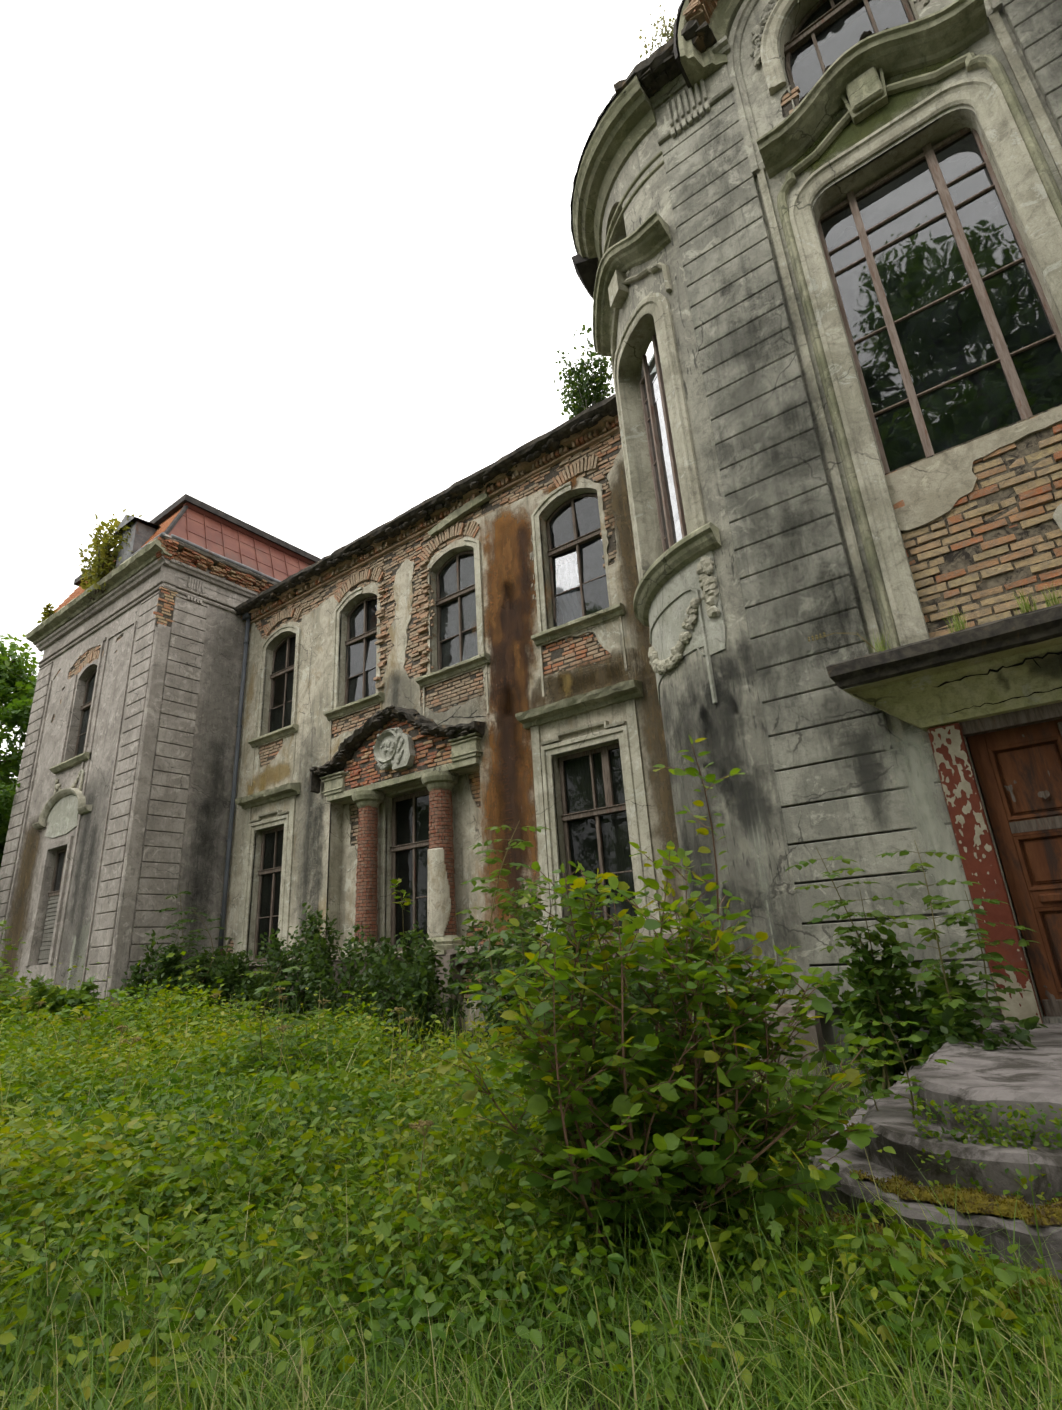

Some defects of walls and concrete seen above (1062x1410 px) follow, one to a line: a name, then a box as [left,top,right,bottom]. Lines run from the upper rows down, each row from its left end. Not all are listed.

flaking render [255,428,622,846]
rust [480,510,540,945]
peeling [928,725,996,922]
flaking render [885,404,1062,638]
peeling [993,949,1057,1024]